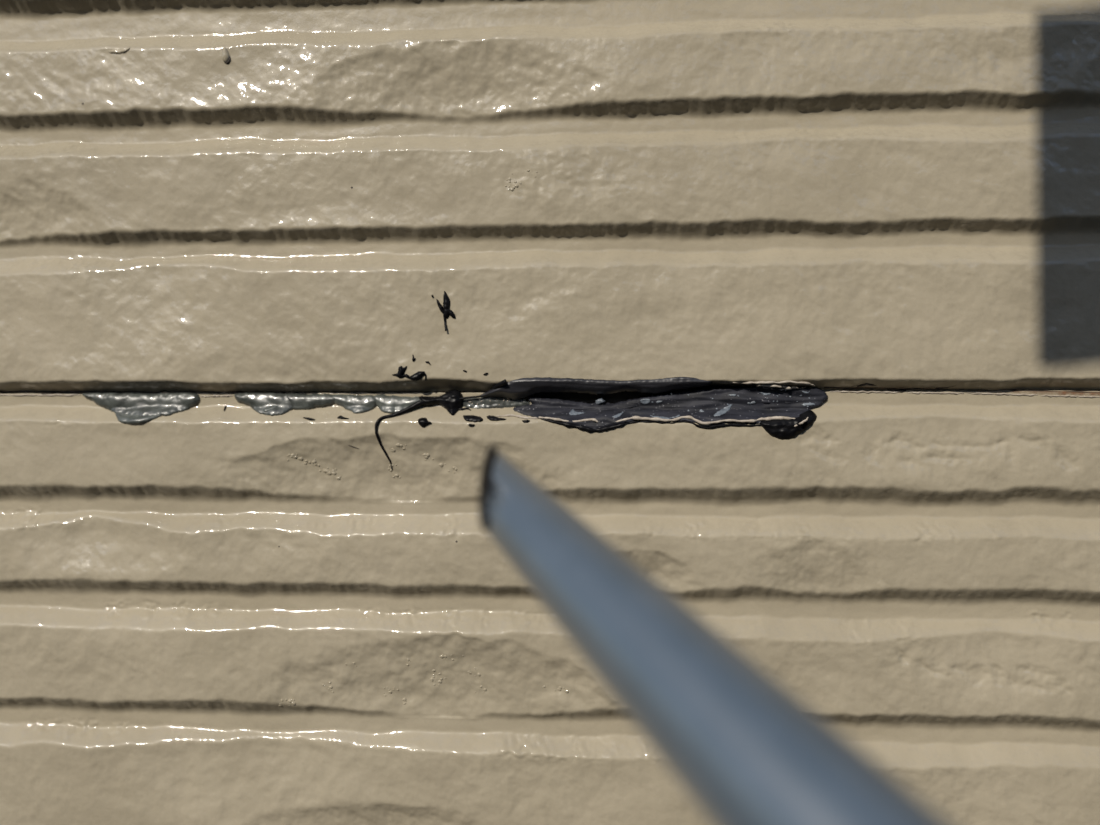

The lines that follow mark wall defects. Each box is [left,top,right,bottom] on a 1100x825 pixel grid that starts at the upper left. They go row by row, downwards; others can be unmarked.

crack [824,383,1100,398]